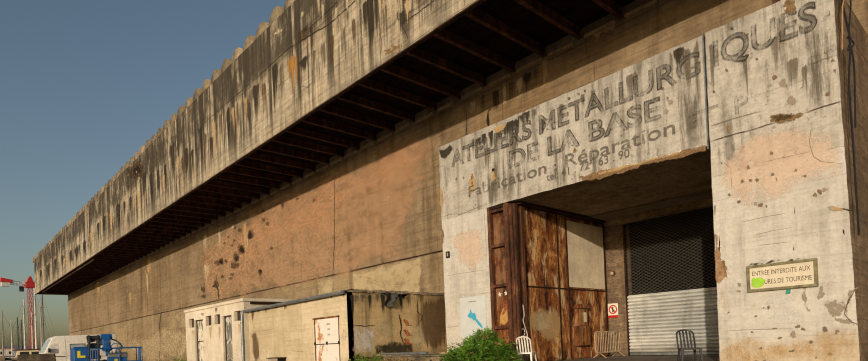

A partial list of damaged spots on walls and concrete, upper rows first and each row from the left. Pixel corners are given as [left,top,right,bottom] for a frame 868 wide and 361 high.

corrosion [287,56,298,85]
water stain [787,58,807,88]
spalling [770,75,803,123]
water stain [40,0,408,278]
spalling [580,145,706,180]
spalling [201,226,253,298]
spalling [714,234,730,283]
water stain [331,294,385,318]
water stain [399,294,446,348]